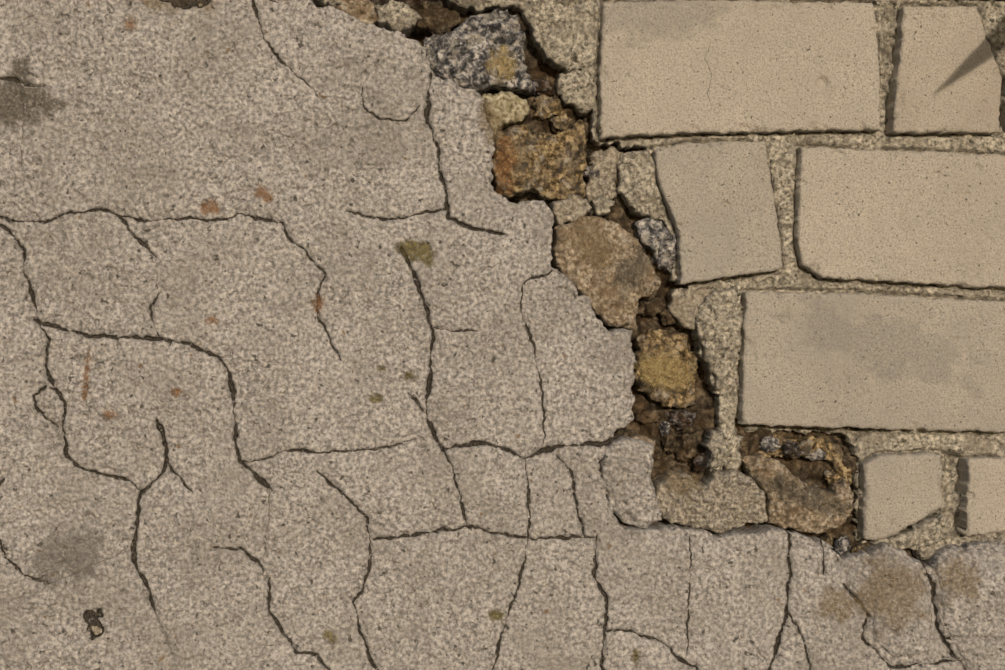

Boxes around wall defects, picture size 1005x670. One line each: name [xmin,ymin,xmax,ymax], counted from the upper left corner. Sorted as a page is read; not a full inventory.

crack [0,77,45,176]
crack [252,0,312,89]
crack [347,73,507,235]
spalling [491,179,553,208]
spalling [411,1,643,183]
spalling [583,177,646,237]
spalling [603,247,717,481]
crack [0,208,698,670]
spalling [735,418,862,492]
spalling [791,510,872,554]
crack [767,529,811,670]
crack [820,539,966,670]